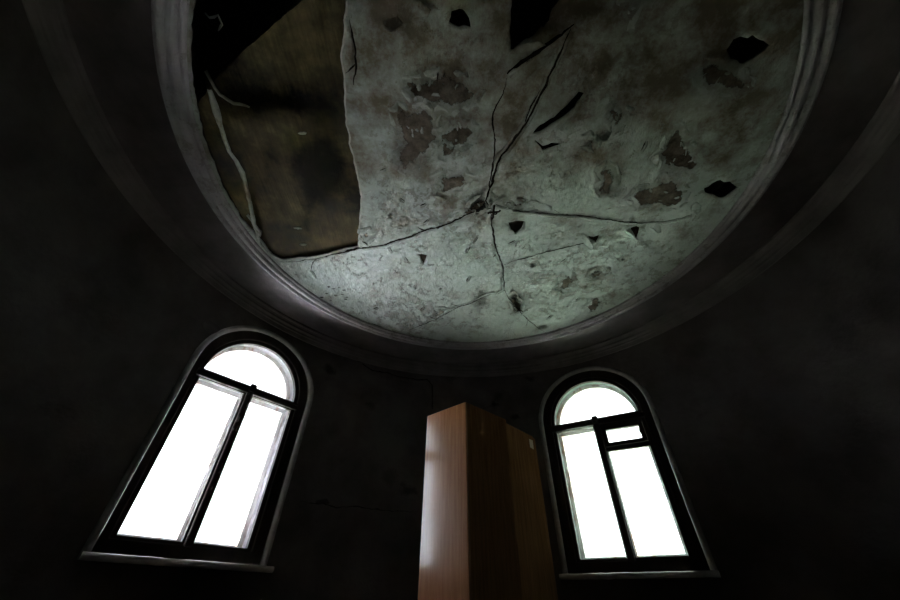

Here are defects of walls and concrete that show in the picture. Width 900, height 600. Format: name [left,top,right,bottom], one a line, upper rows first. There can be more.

flaking render [449,9,470,26]
peeling [685,35,768,101]
flaking render [191,0,375,260]
crack [280,20,692,333]
flaking render [704,180,736,197]